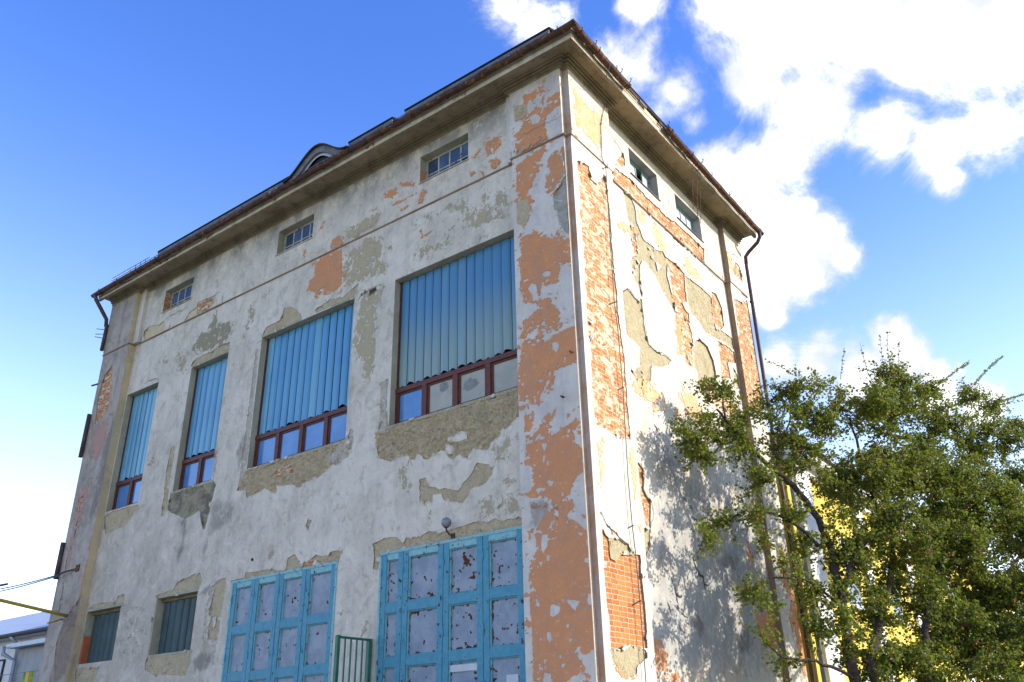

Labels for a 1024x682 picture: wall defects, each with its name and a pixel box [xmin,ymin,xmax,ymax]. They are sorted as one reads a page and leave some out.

peeling [303,235,359,312]
spalling [53,476,125,681]
flaking render [88,366,113,460]
spalling [103,505,140,534]
spalling [161,446,218,529]
spalling [238,348,354,497]
rust [379,539,525,682]
peeling [372,78,762,682]